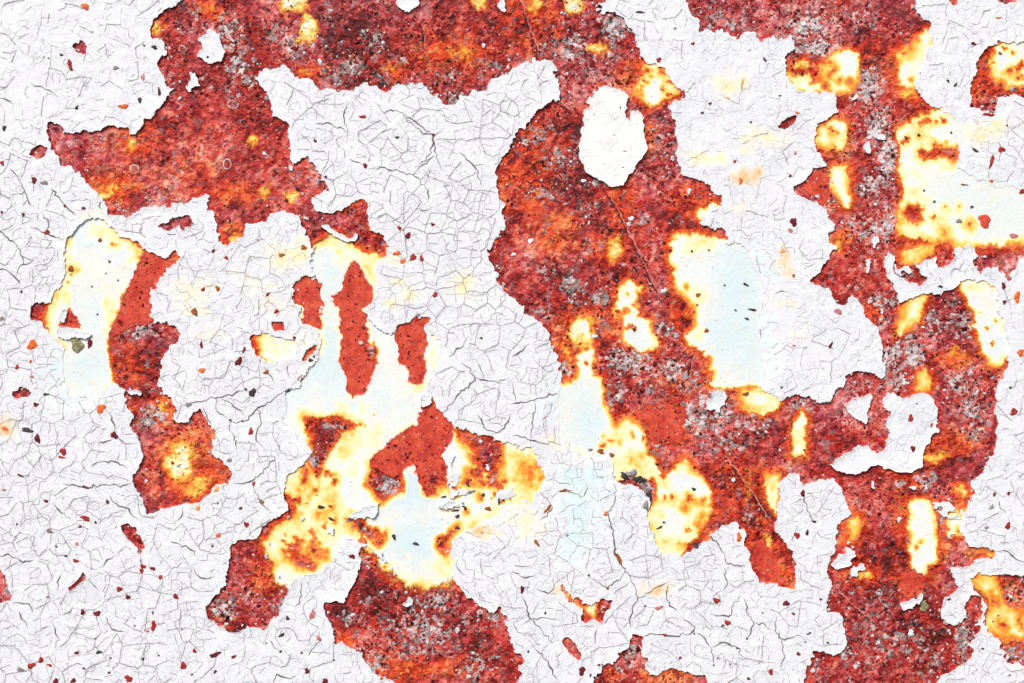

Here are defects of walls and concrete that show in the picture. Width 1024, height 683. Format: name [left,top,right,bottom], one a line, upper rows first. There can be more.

peeling [12,218,232,515]
crack [0,0,373,683]
peeling [47,0,644,683]
rust [392,251,424,264]
crack [263,66,843,683]
crack [615,0,880,394]
peeling [487,0,1024,683]
crack [920,2,1024,187]
crack [926,260,1024,618]
rust [970,206,991,228]
crack [946,635,1024,683]